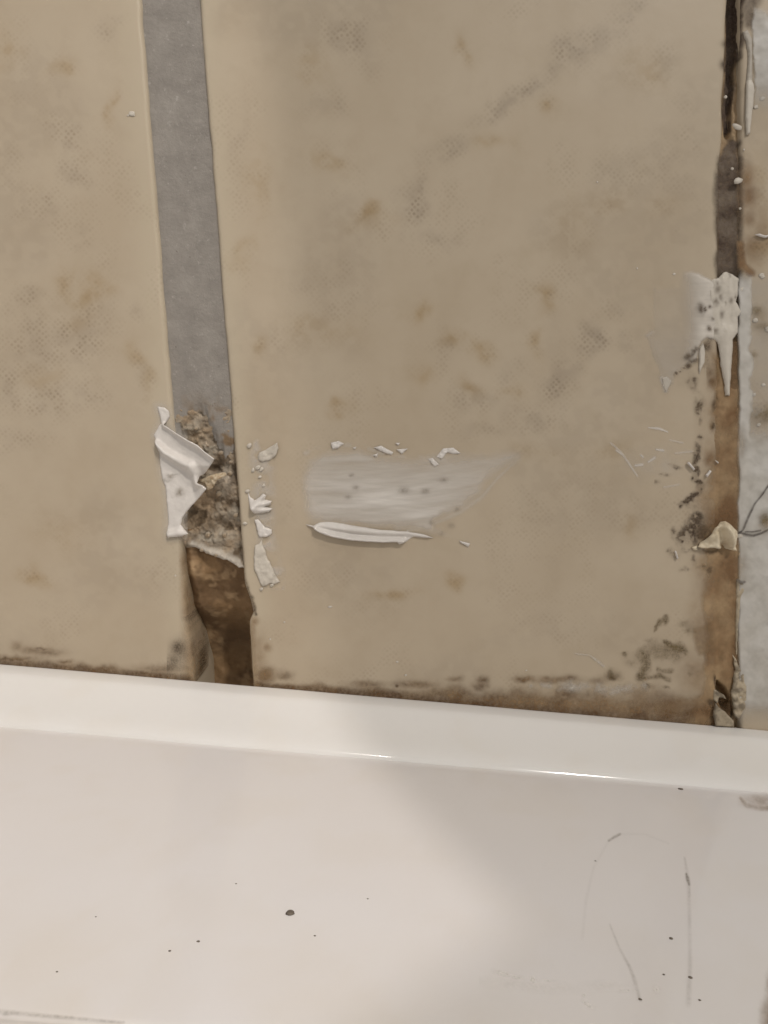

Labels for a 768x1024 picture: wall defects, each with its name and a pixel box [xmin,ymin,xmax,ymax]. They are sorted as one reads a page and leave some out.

water stain [715,0,755,278]
peeling [200,472,227,490]
water stain [679,436,719,507]
water stain [672,513,706,559]
peeling [692,521,738,551]
water stain [171,641,205,681]